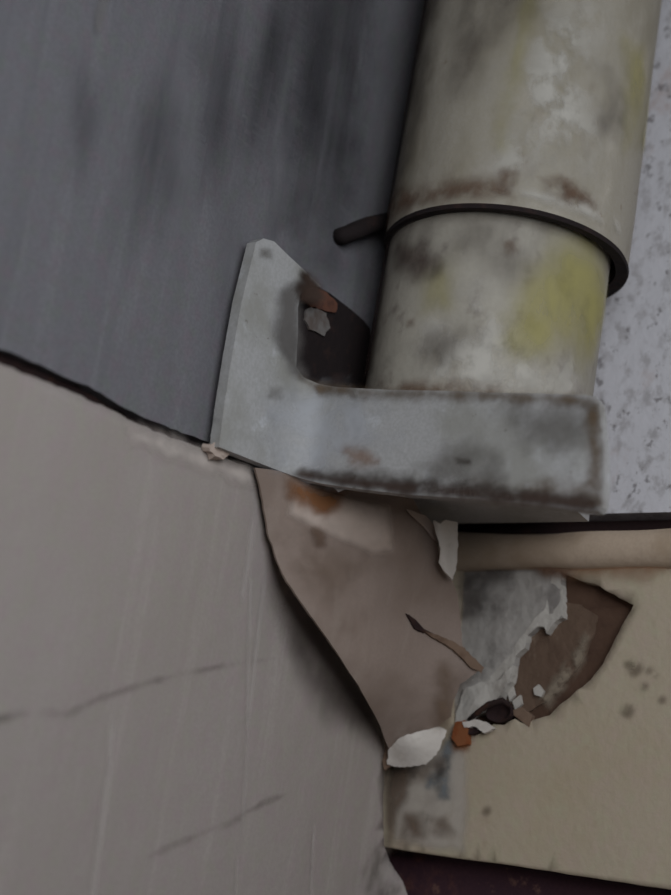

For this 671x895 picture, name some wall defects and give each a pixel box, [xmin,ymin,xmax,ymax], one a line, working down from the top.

corrosion [363,0,629,379]
corrosion [299,273,338,313]
spalling [454,569,633,727]